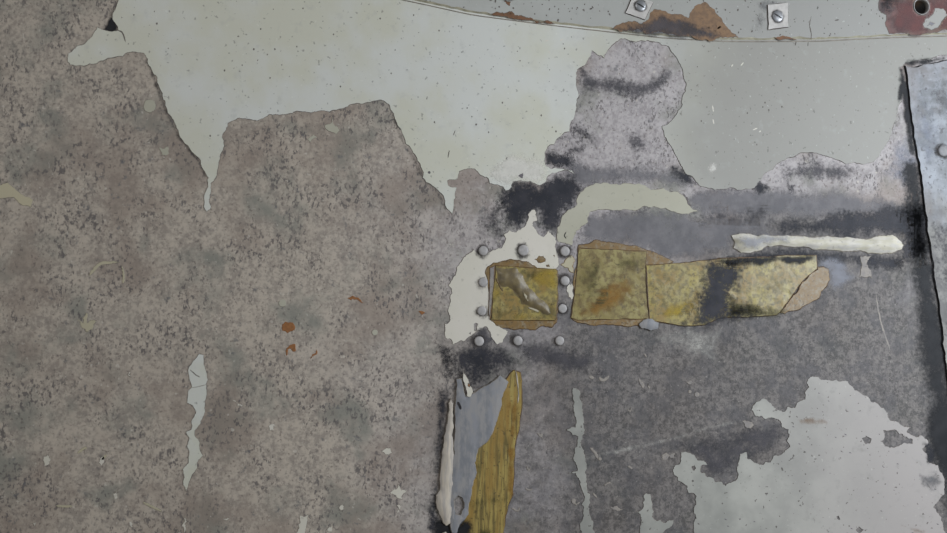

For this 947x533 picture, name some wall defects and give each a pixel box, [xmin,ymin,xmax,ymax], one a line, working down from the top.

rust [878,0,947,36]
peeling [68,0,947,213]
water stain [898,59,939,154]
peeling [444,182,698,344]
peeling [183,354,208,490]
peeling [566,388,602,533]
peeling [638,493,674,533]
peeling [662,376,946,533]